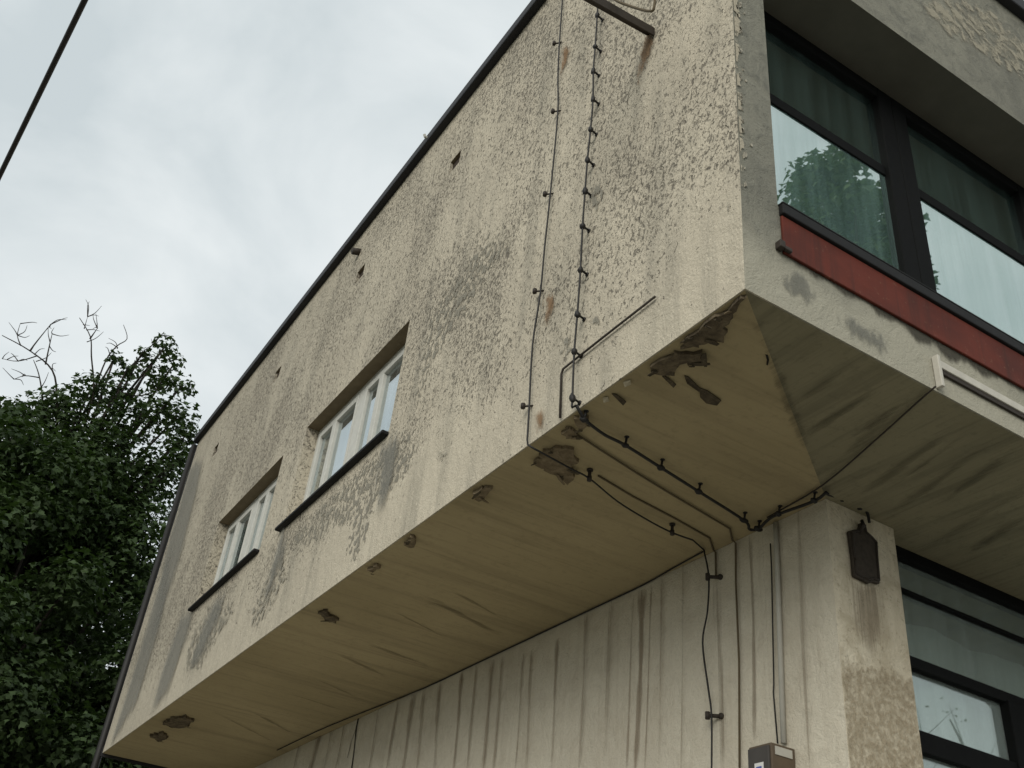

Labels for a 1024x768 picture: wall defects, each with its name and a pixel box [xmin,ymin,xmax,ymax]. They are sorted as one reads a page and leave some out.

flaking render [648,294,747,406]
flaking render [531,410,590,485]
flaking render [251,432,418,625]
flaking render [150,714,195,742]